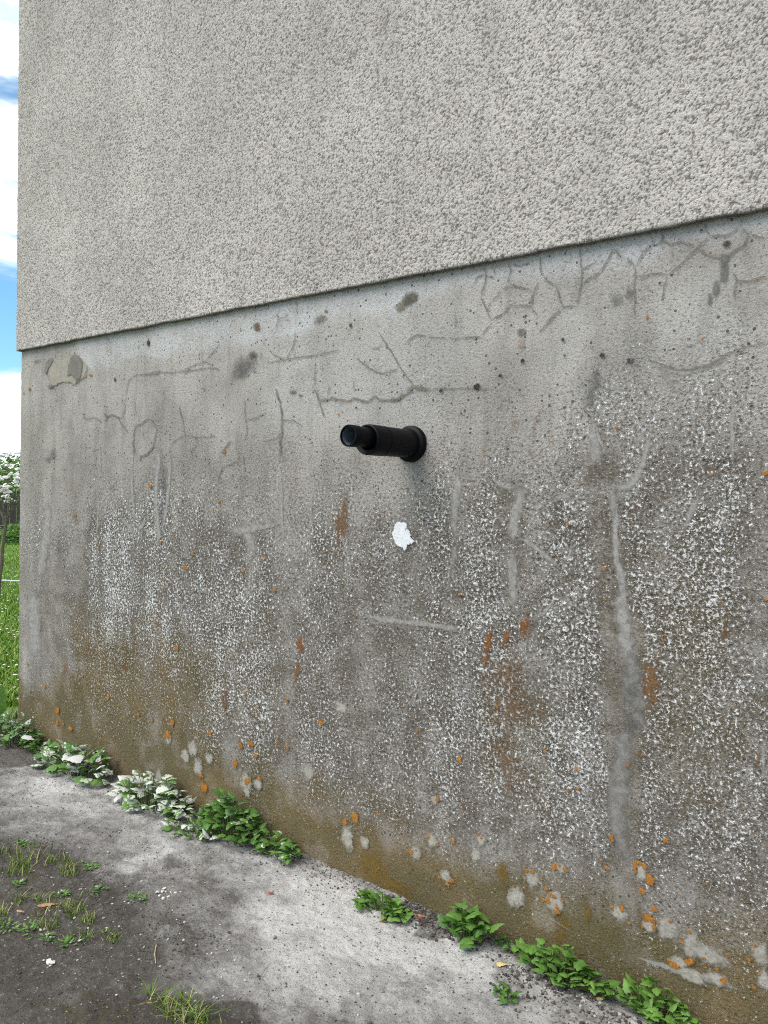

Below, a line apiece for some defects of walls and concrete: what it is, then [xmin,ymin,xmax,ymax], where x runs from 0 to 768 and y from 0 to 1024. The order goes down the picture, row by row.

peeling [44,354,87,388]
crack [82,219,766,479]
rust [336,497,347,541]
leakage [26,595,43,655]
leakage [367,615,456,631]
leakage [607,433,651,859]
efflorescence [643,959,680,974]